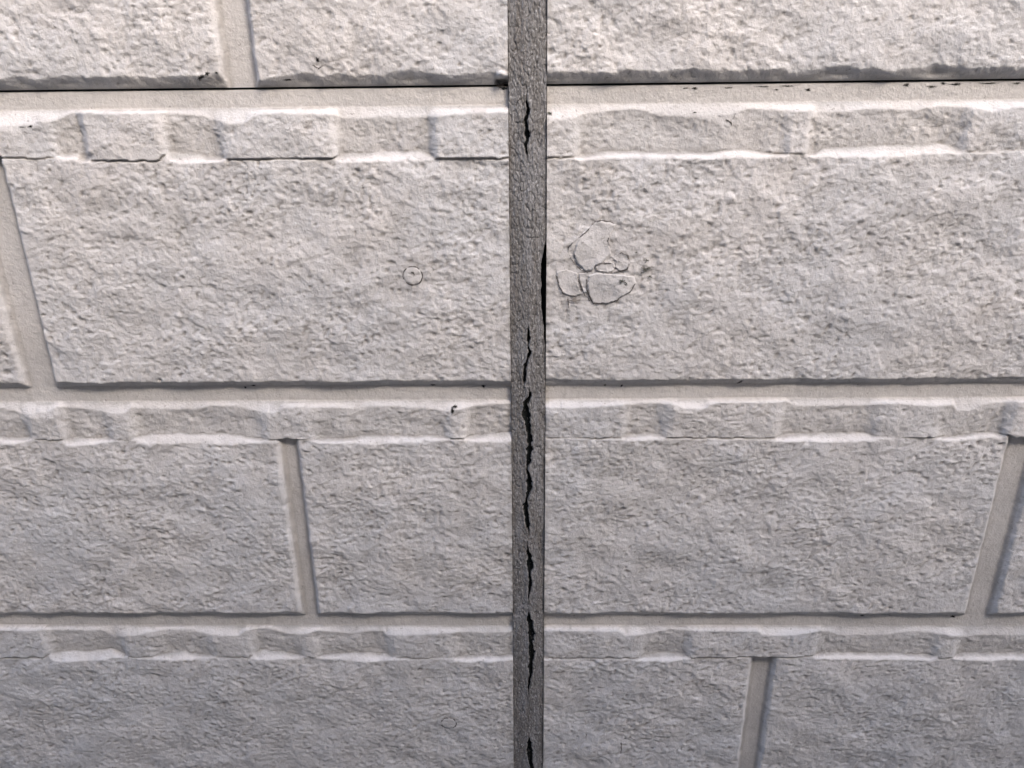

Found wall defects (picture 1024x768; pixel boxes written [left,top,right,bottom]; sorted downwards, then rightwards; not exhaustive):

crack [523,101,531,154]
peeling [556,220,652,306]
crack [522,328,535,691]
crack [526,737,534,768]